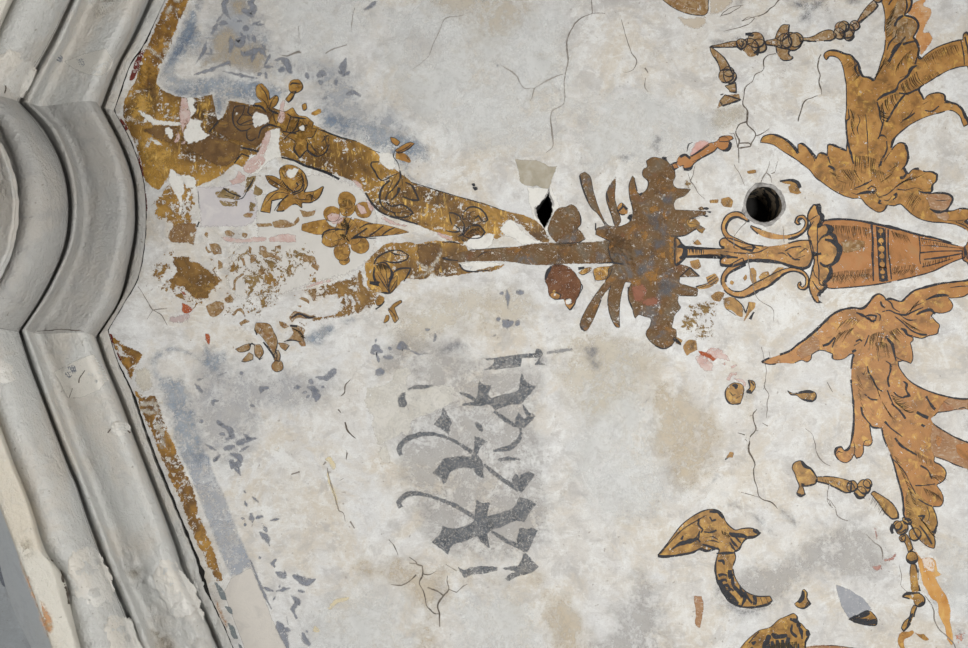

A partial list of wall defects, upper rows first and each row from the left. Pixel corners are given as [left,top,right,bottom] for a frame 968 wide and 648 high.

crack [720,0,779,31]
flaking render [138,97,209,145]
flaking render [247,128,281,174]
crack [501,0,595,153]
crack [732,53,778,183]
crack [798,55,822,122]
flaking render [168,169,196,212]
spalling [463,159,559,271]
spalling [710,170,801,227]
peeling [153,248,316,319]
crack [739,347,778,509]
crack [389,540,467,627]